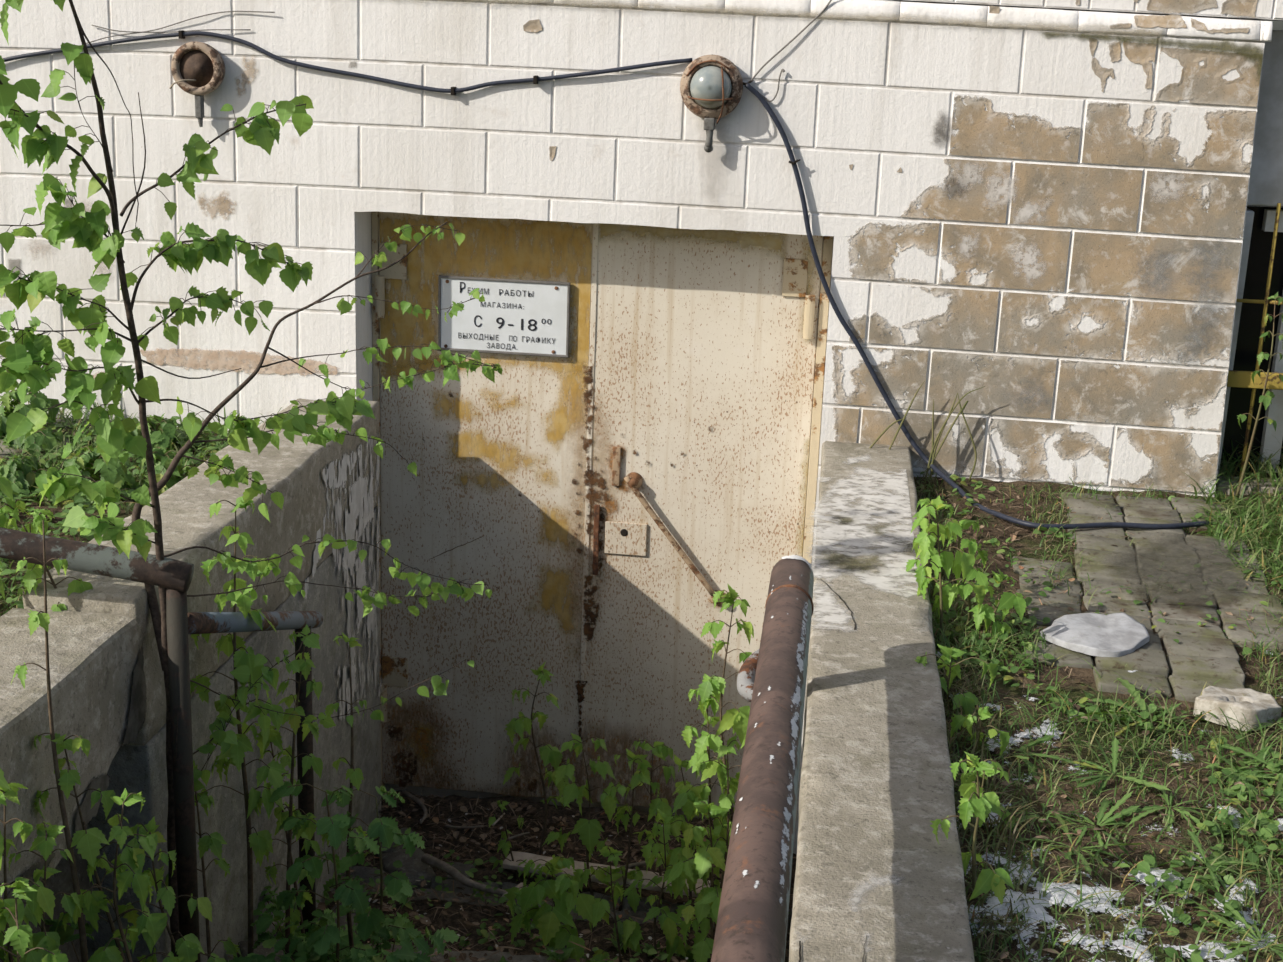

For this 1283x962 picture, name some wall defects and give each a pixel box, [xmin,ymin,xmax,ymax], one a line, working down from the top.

peeling [305,436,382,721]
peeling [434,394,552,489]
peeling [542,510,569,547]
peeling [379,216,783,444]
rust [572,366,650,641]
peeling [770,0,1260,904]